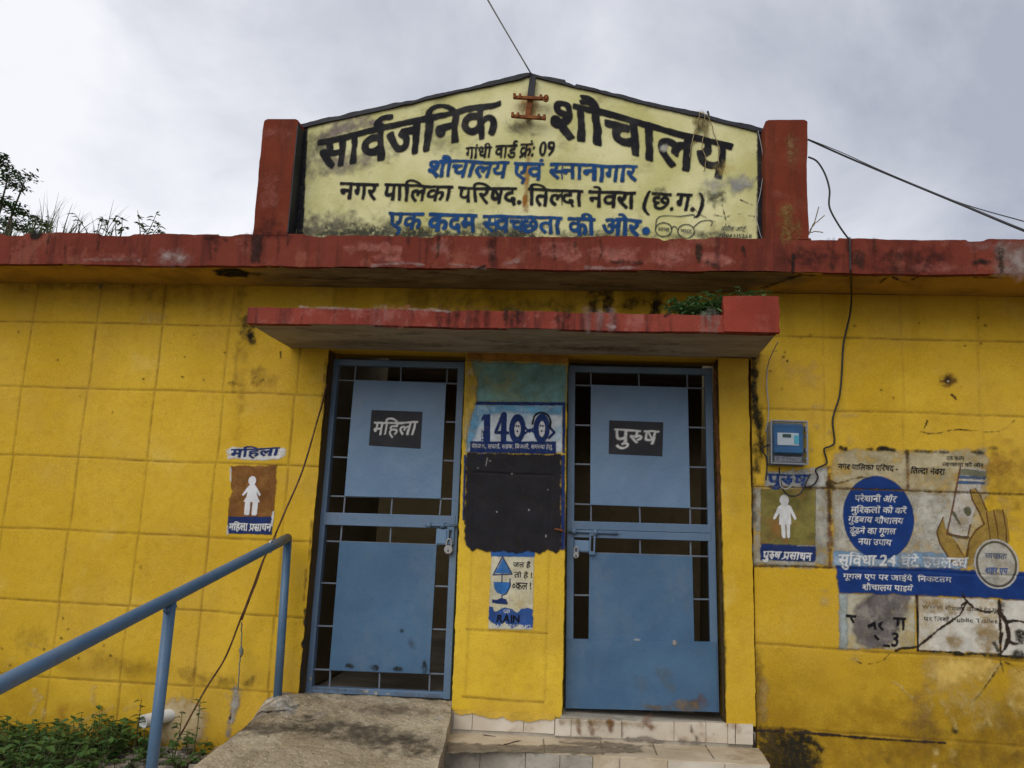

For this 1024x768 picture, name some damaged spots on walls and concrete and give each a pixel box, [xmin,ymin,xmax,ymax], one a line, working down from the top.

damp [214,235,263,277]
damp [303,210,536,260]
damp [750,354,765,472]
crack [858,593,1024,701]
damp [755,731,823,768]